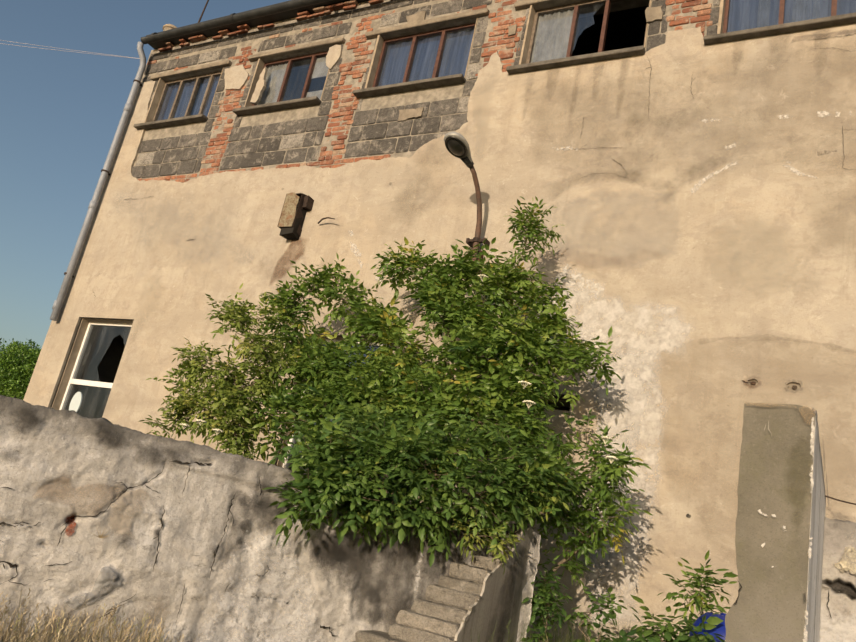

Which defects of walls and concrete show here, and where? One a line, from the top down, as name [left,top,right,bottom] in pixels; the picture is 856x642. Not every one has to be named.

peeling [645,0,720,52]
peeling [132,0,530,183]
water stain [535,266,690,624]
crack [0,460,212,585]
crack [209,493,299,607]
spalling [825,547,856,599]